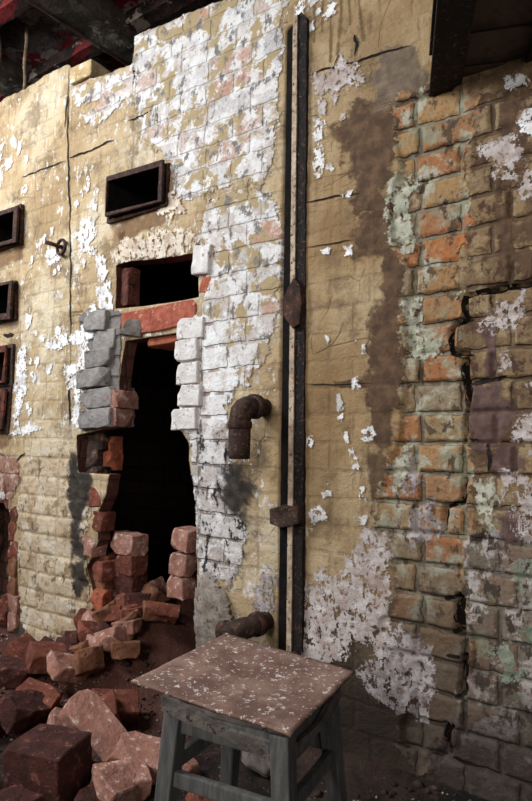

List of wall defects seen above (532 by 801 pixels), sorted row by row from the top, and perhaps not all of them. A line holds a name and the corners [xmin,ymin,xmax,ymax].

peeling [0,140,28,187]
peeling [8,344,41,437]
crack [21,69,113,425]
peeling [25,0,337,587]
peeling [310,52,366,178]
leakage [327,45,429,517]
spalling [296,73,532,801]
crack [448,284,532,471]
peeling [250,565,279,614]